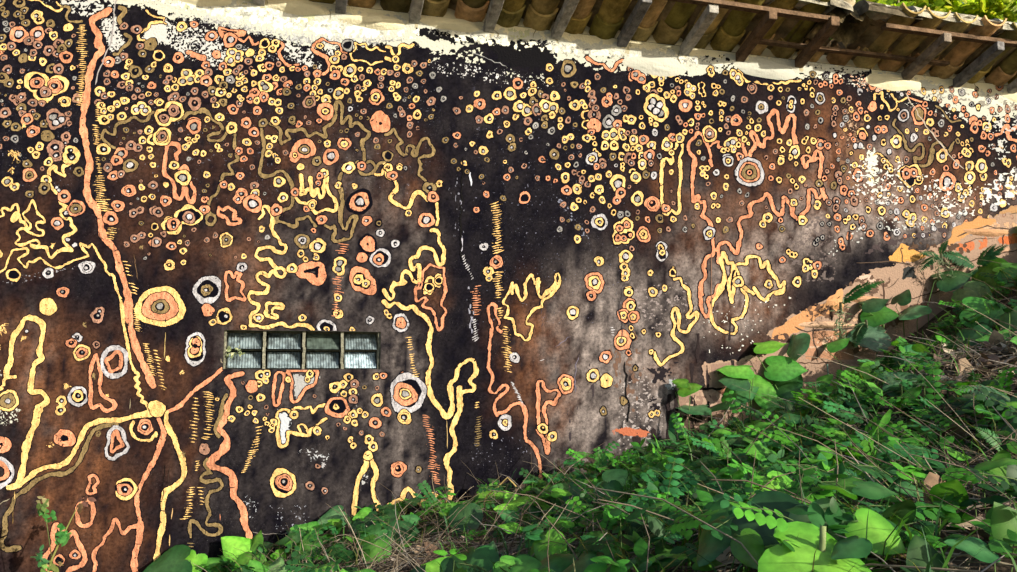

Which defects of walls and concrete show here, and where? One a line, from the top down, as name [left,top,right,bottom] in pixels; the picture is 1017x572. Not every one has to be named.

flaking render [49,0,899,88]
flaking render [905,76,1017,129]
spalling [618,190,1017,450]